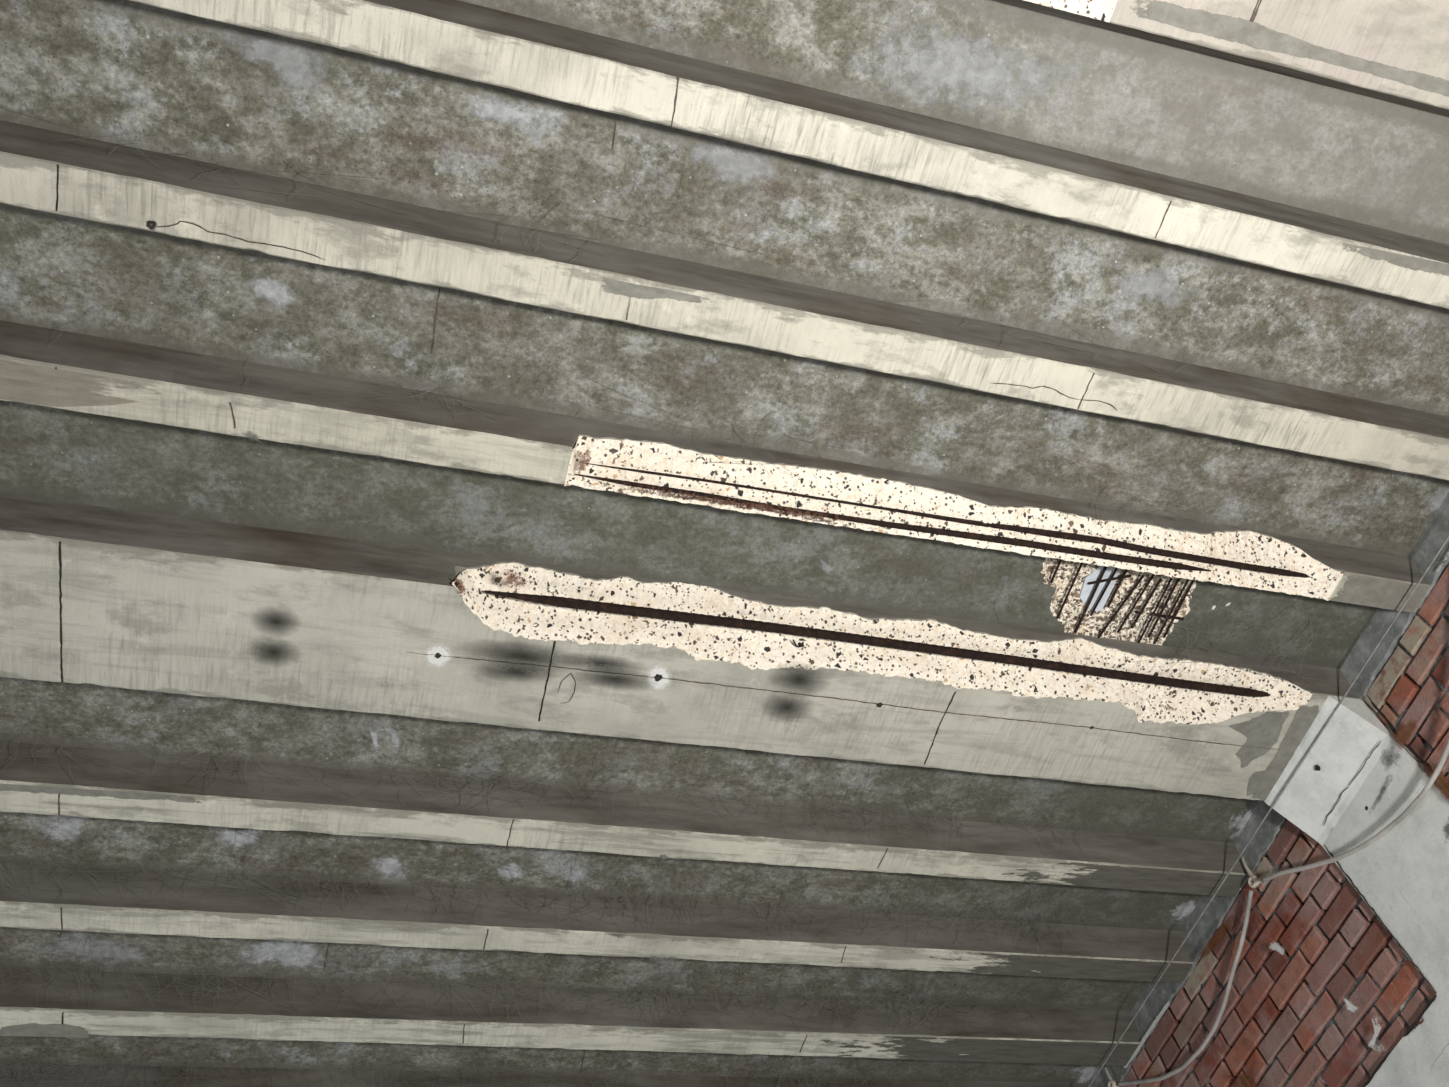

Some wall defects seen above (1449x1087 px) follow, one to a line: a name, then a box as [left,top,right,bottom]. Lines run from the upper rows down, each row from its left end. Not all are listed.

spalling [1025,0,1118,22]
crack [146,221,324,260]
crack [992,383,1118,411]
spalling [452,436,1344,725]